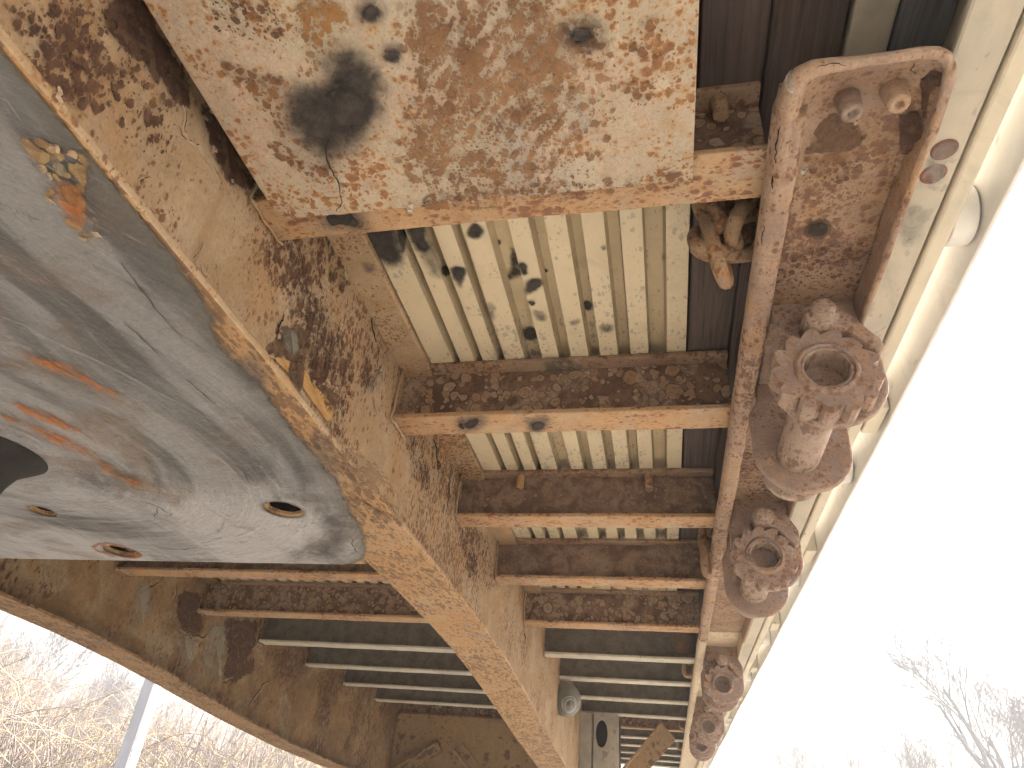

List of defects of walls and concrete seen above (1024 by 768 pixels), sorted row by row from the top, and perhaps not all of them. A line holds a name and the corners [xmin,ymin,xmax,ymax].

rust [212,0,348,78]
rust [220,63,330,184]
rust [396,0,697,210]
rust [803,113,885,186]
rust [899,70,942,154]
rust [775,242,872,296]
rust [28,357,118,395]
rust [1,403,92,456]
rust [176,590,203,638]
rust [223,617,258,683]